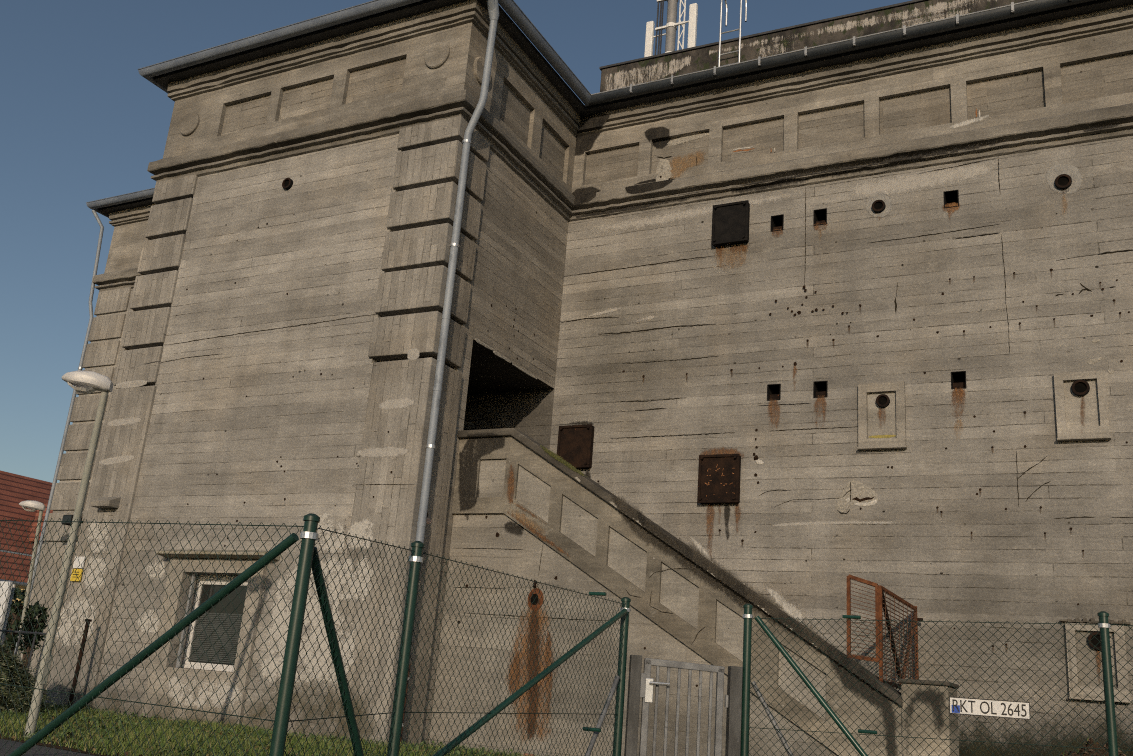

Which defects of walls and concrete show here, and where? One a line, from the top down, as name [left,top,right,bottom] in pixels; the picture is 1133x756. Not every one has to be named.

spalling [656,132,709,182]
water stain [459,433,505,520]
corrosion [707,503,740,539]
spalling [836,480,878,514]
peeling [260,513,374,687]
corrosion [509,605,552,738]